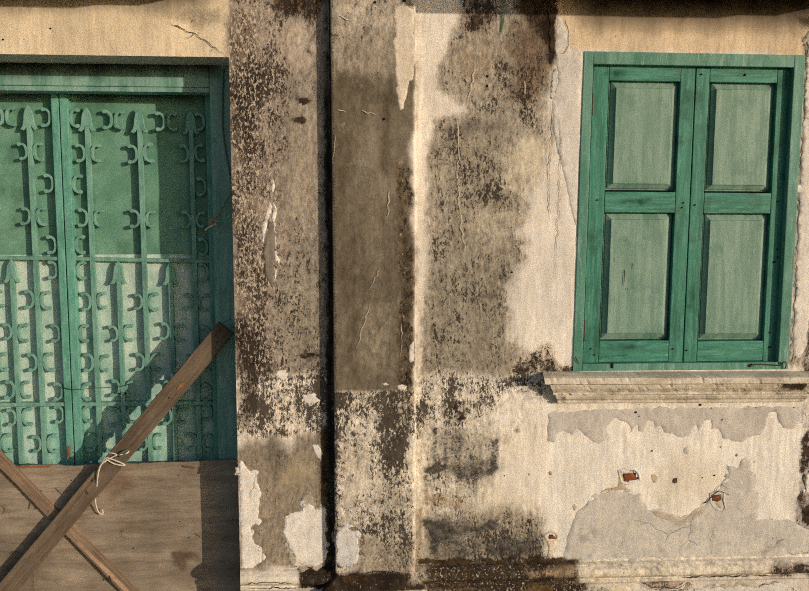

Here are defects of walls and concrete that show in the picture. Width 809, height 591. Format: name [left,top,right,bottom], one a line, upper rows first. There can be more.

water stain [549,0,558,52]
peeling [393,3,416,110]
crack [548,102,563,280]
water stain [517,356,564,373]
water stain [424,401,499,487]
spalling [617,468,641,492]
spalling [709,490,726,512]
water stain [418,519,578,566]
spalling [544,530,559,542]